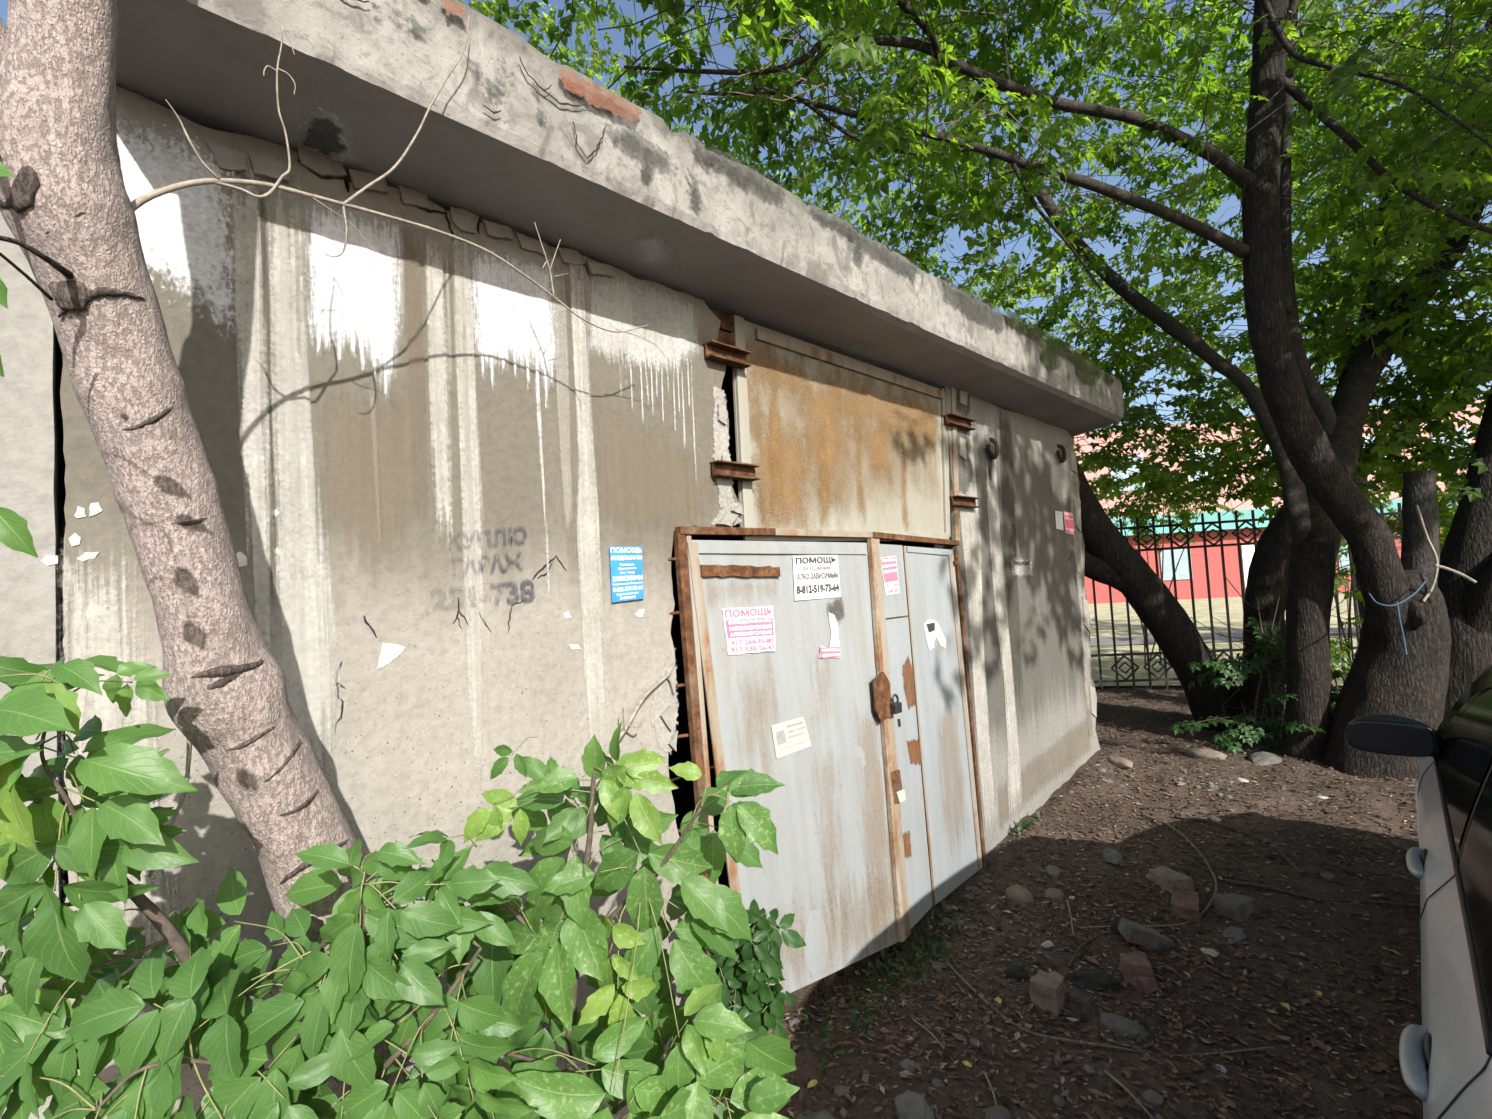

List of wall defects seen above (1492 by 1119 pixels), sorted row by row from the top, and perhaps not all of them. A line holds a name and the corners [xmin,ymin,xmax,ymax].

flaking render [559,69,642,124]
spalling [206,111,615,281]
leakage [116,114,698,779]
spalling [711,387,744,527]
crack [453,556,567,633]
corrosion [828,599,844,620]
corrosion [903,657,916,708]
corrosion [907,739,921,765]
corrosion [903,831,912,857]